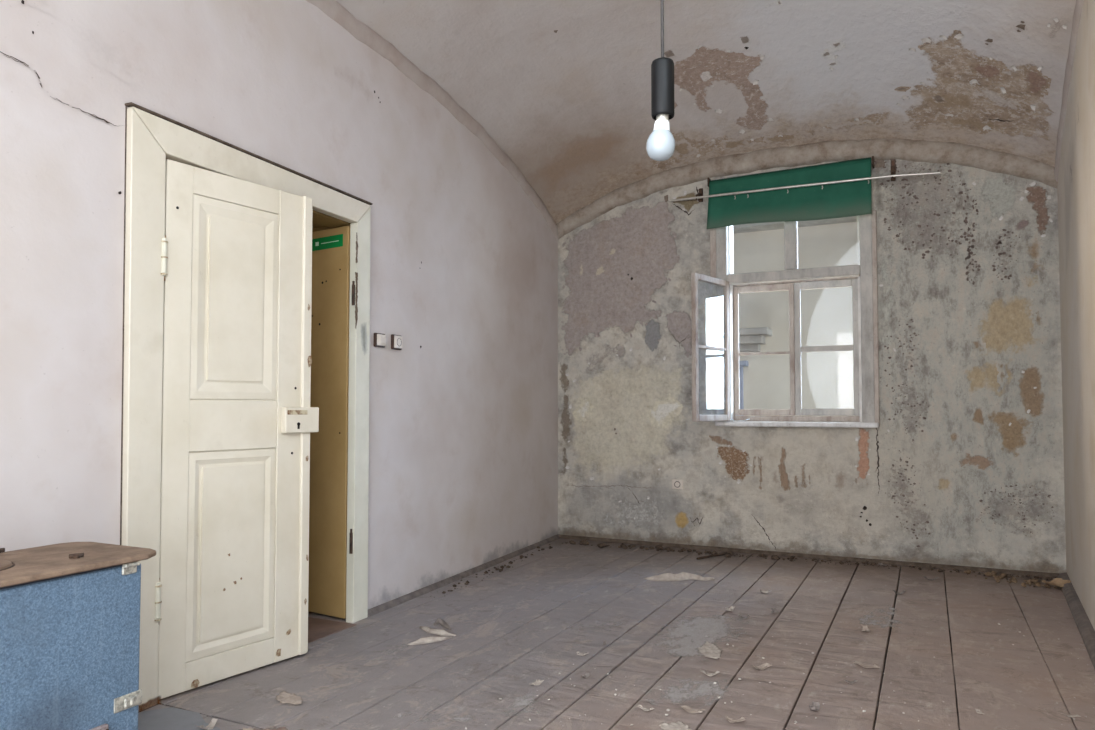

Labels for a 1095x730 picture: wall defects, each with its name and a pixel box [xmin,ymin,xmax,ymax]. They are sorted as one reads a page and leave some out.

crack [1,52,125,126]
peeling [643,26,1063,171]
peeling [966,171,1053,239]
peeling [558,187,701,532]
water stain [560,100,1078,573]
spalling [707,434,813,507]